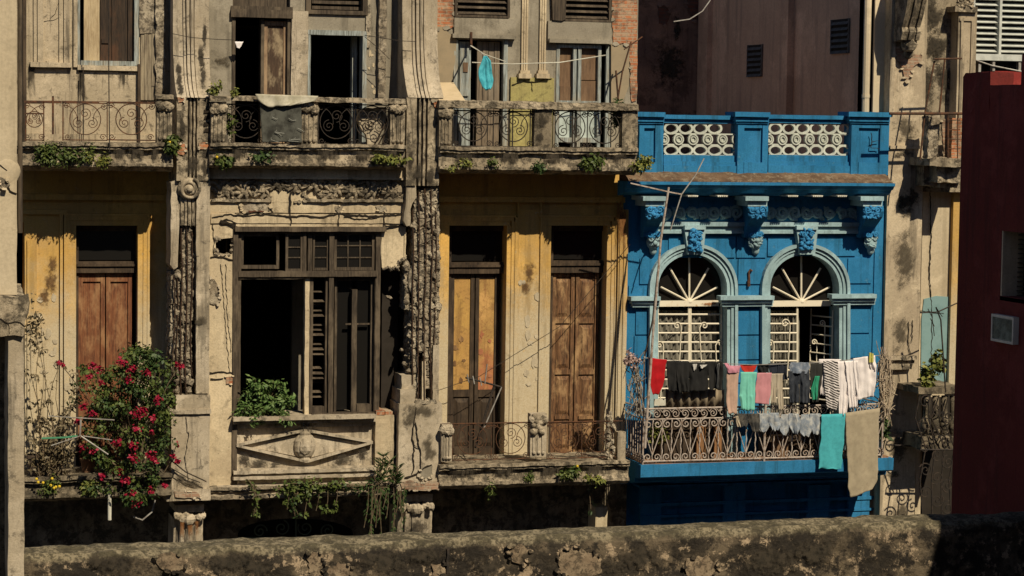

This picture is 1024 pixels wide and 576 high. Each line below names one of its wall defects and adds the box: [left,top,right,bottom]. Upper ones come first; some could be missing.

spalling [437,0,458,31]
spalling [608,0,638,103]
leakage [39,258,56,302]
spalling [213,236,233,257]
spalling [381,187,442,400]
leakage [894,232,915,288]
leakage [895,318,909,350]
crack [405,407,432,482]